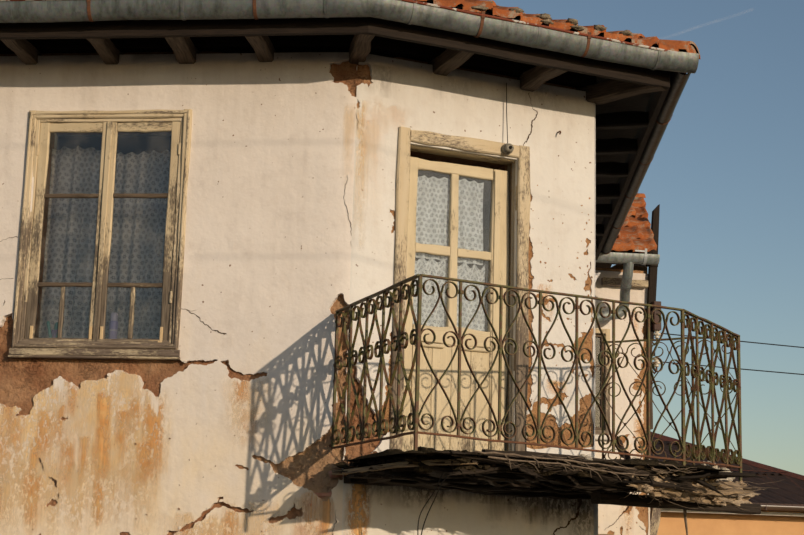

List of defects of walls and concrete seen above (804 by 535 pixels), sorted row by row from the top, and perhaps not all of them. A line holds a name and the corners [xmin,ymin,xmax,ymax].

spalling [329,61,372,108]
leakage [0,385,83,516]
leakage [73,372,162,491]
spalling [0,316,268,416]
spalling [252,295,392,505]
peeling [526,197,594,450]
peeling [620,309,647,460]
spalling [167,497,253,535]
spalling [269,504,312,524]
crack [553,499,582,535]
peeling [598,506,648,535]